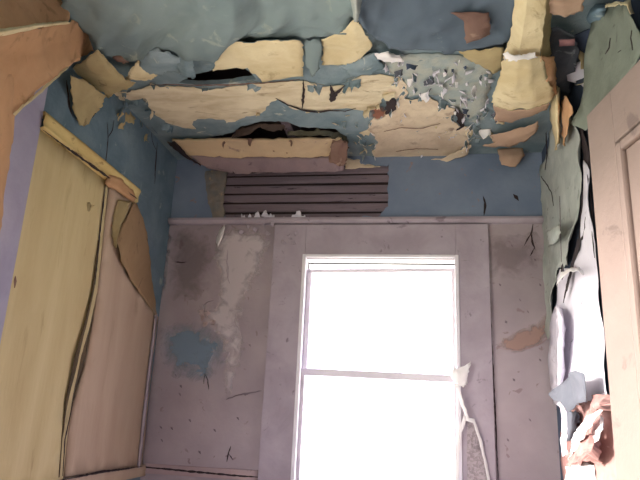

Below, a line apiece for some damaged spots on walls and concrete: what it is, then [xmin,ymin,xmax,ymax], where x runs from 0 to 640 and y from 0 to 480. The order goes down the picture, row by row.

peeling [61,0,514,161]
peeling [550,4,606,106]
crack [525,225,535,256]